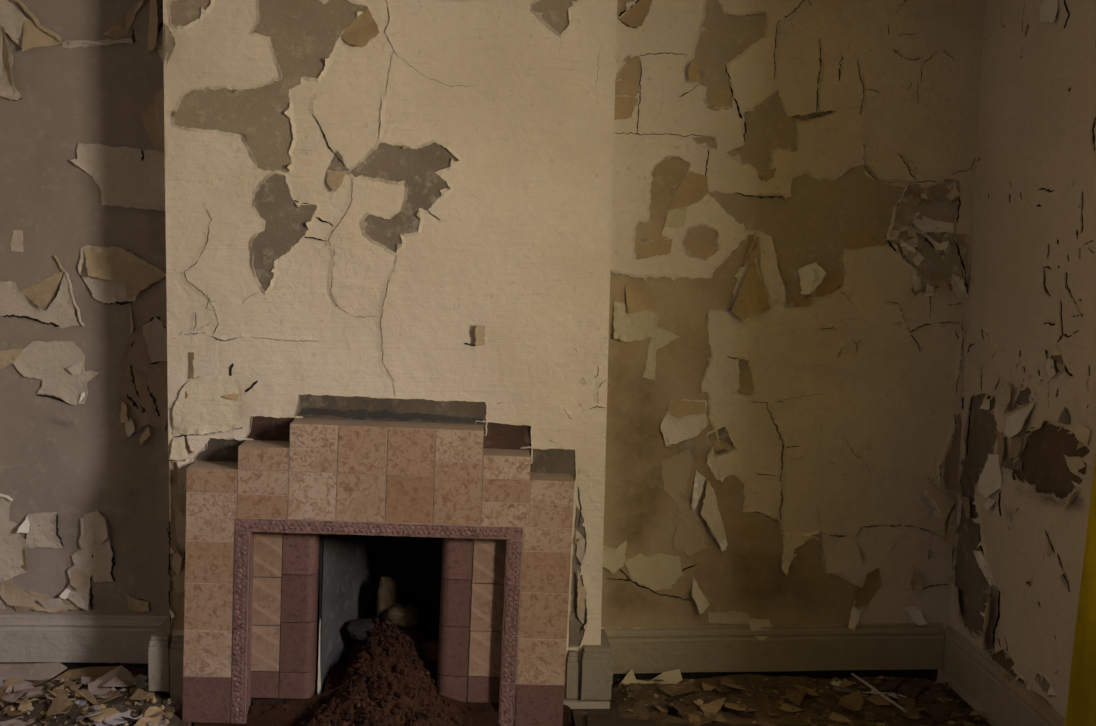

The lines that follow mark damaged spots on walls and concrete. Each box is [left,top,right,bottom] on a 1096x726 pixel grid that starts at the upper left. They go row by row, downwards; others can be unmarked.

peeling [70,0,379,296]
peeling [312,114,463,256]
crack [378,0,471,142]
crack [774,0,812,79]
crack [816,38,880,119]
crack [1088,113,1096,152]
peeling [0,245,168,445]
peeling [601,0,971,640]
peeling [0,493,116,613]
flaking render [168,393,588,647]
crack [745,397,800,532]
peeling [911,382,1092,707]